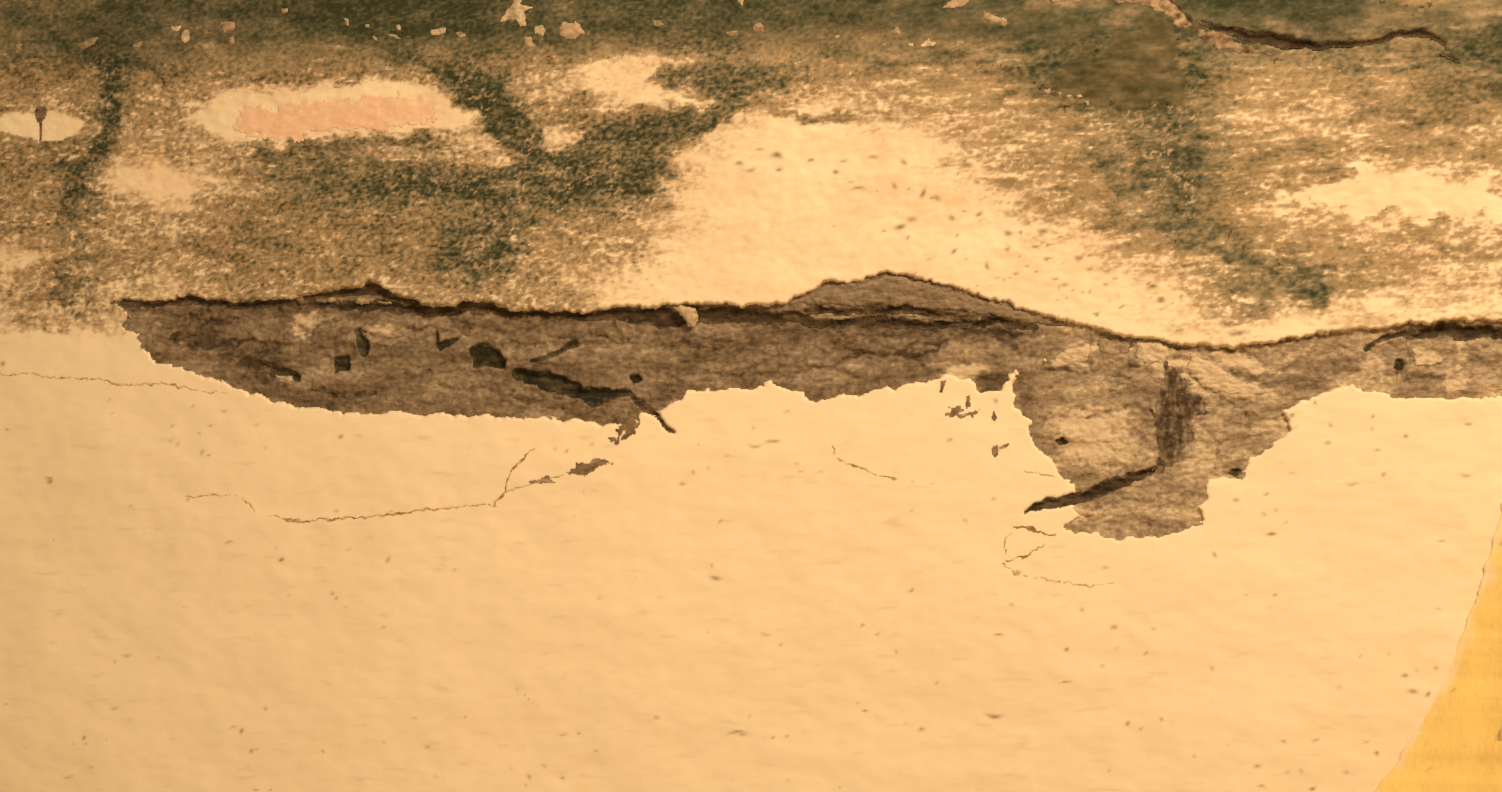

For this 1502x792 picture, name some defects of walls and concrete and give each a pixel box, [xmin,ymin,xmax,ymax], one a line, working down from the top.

water stain [0,0,1502,333]
crack [1199,20,1461,63]
spalling [118,272,1502,541]
crack [1364,323,1502,352]